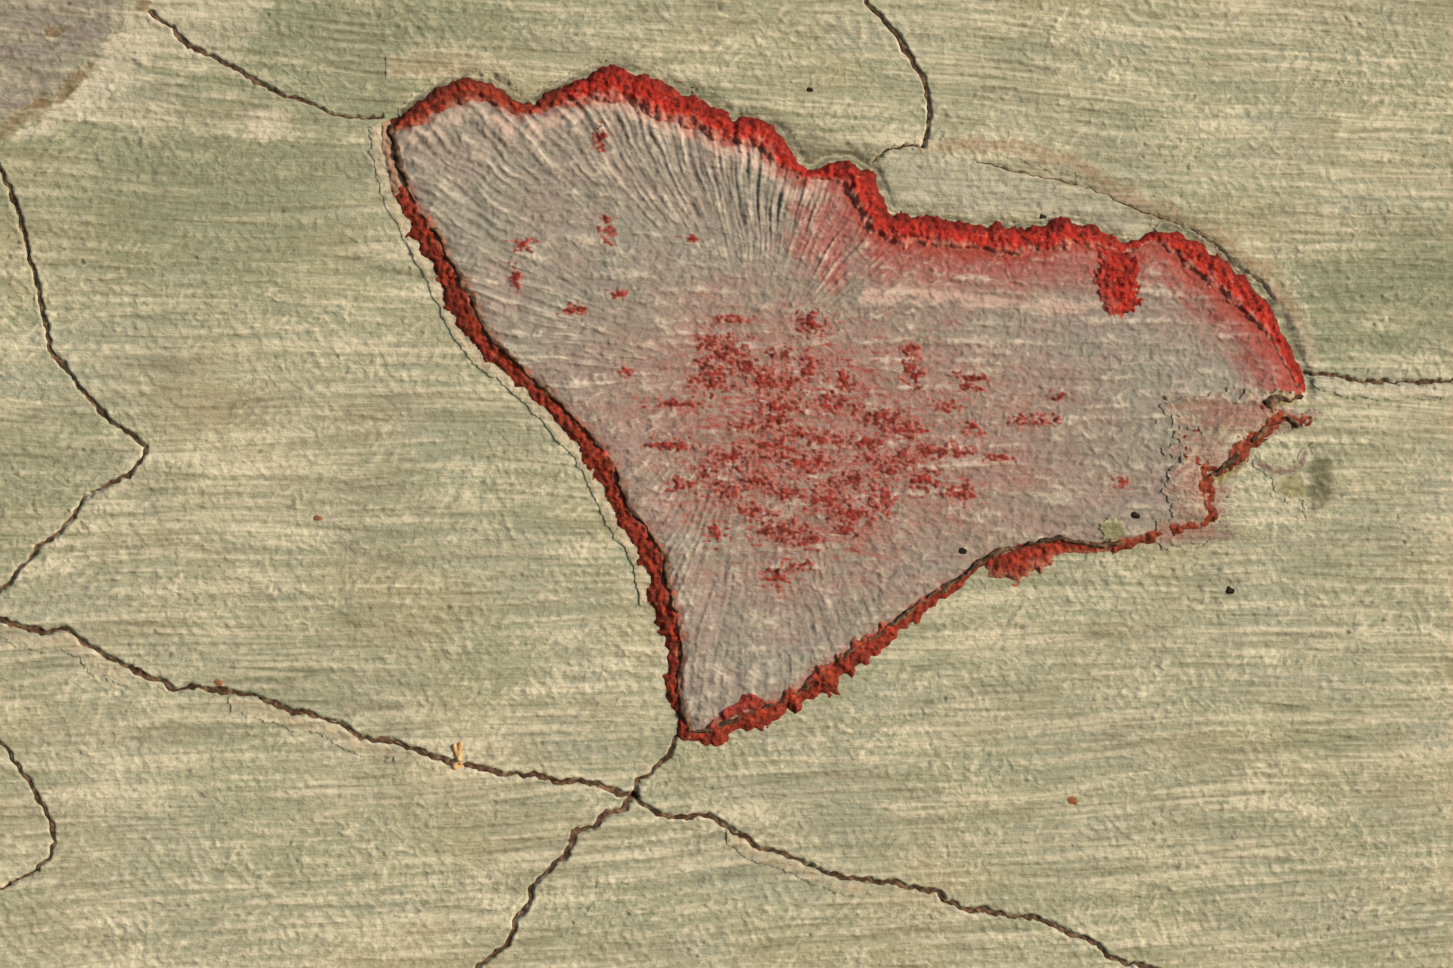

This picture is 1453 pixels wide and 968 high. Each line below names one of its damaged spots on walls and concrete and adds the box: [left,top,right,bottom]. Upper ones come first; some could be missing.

crack [148,11,383,120]
crack [864,0,932,163]
crack [976,161,1275,301]
crack [1303,371,1453,401]
crack [0,169,1155,968]